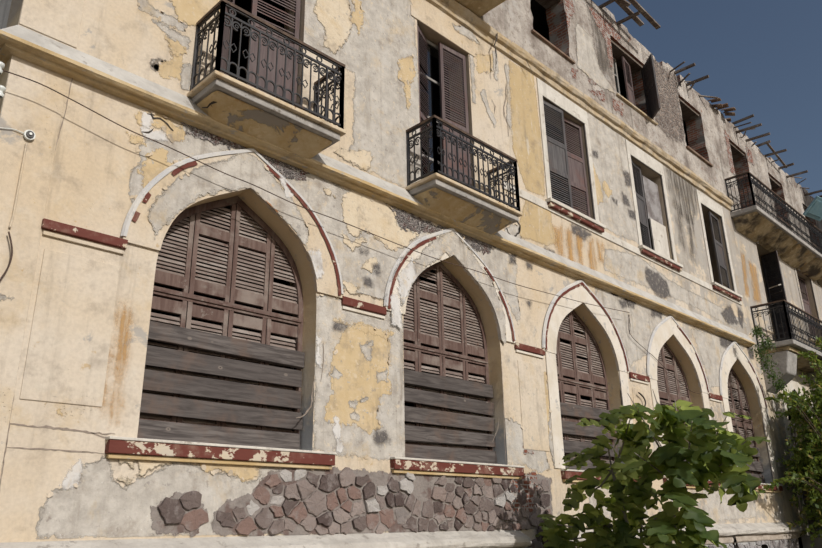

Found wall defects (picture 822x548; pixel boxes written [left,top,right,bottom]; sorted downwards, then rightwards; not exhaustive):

peeling [137,0,220,90]
crack [55,78,73,150]
crack [142,113,174,133]
flaking render [304,0,421,188]
flaking render [35,111,560,539]
crack [0,398,115,485]